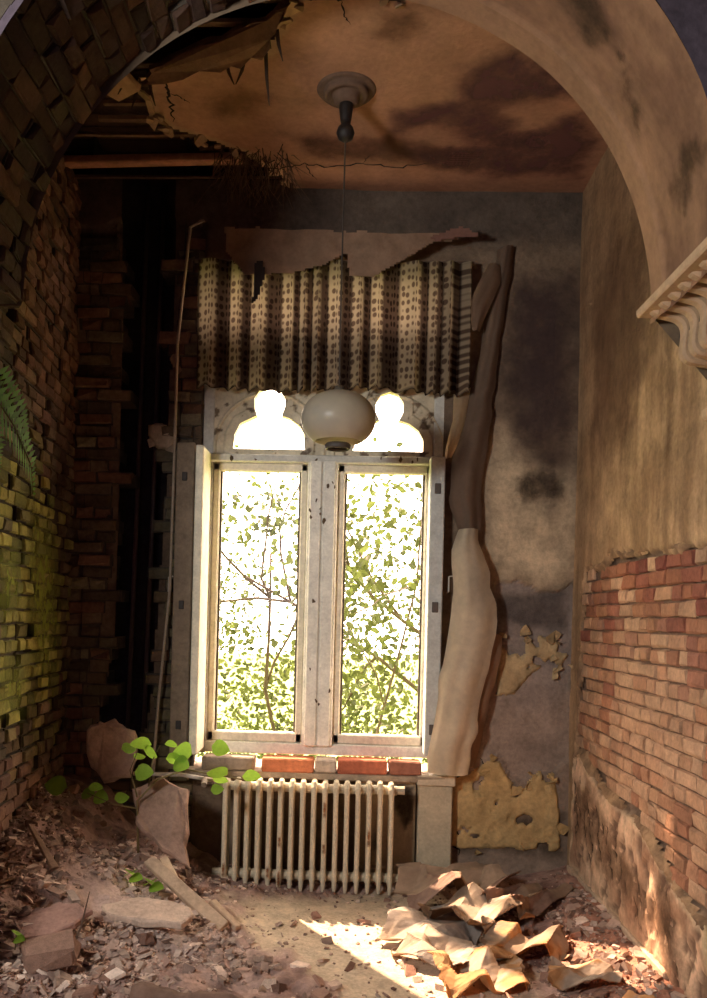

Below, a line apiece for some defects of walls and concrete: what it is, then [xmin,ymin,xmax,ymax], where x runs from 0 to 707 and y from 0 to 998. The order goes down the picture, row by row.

peeling [277,0,304,30]
water stain [303,54,596,177]
water stain [520,475,562,498]
spalling [495,542,707,931]
peeling [451,754,569,855]